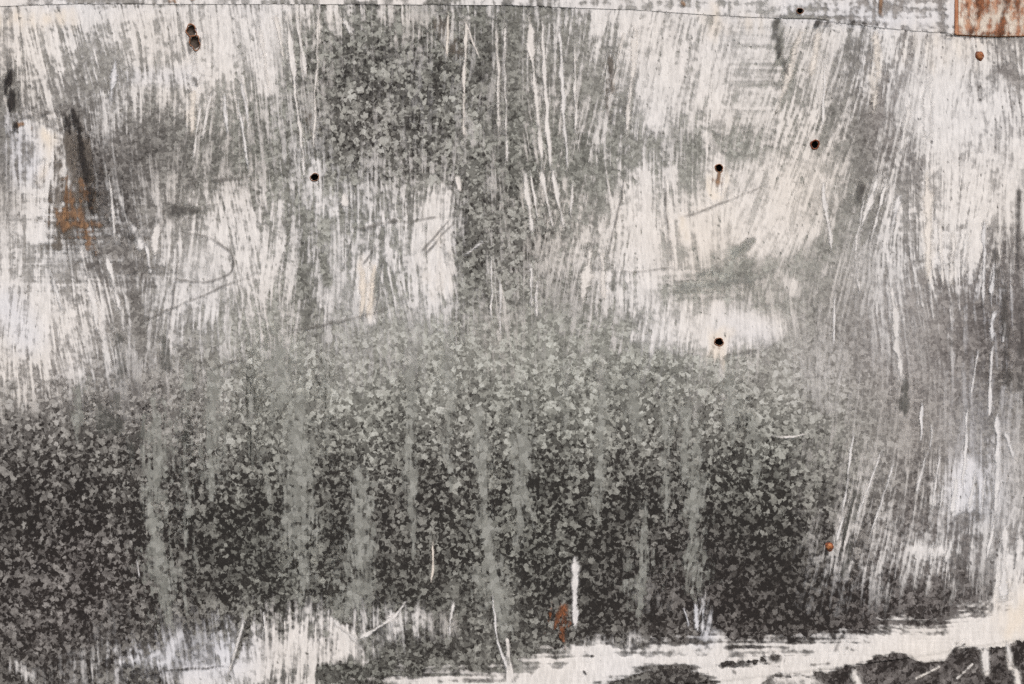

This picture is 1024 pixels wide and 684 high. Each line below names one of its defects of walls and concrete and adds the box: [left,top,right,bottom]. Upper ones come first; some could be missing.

rust [967,0,1021,37]
rust [56,178,101,246]